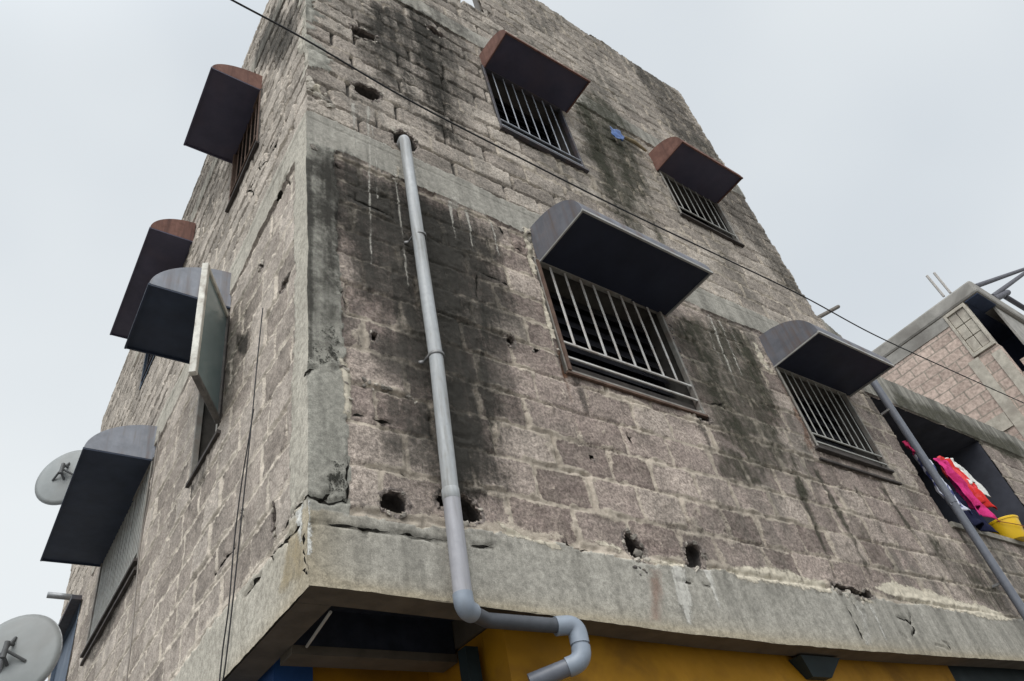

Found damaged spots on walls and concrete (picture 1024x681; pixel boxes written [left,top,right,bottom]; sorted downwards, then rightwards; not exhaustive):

spalling [349,81,383,102]
damp [369,4,463,142]
damp [306,103,498,494]
damp [672,315,795,483]
crack [246,460,447,596]
spalling [376,487,413,519]
spalling [432,488,444,511]
spalling [459,489,486,527]
spalling [621,528,651,576]
spalling [682,540,708,572]
damp [795,478,825,550]
damp [815,471,867,565]